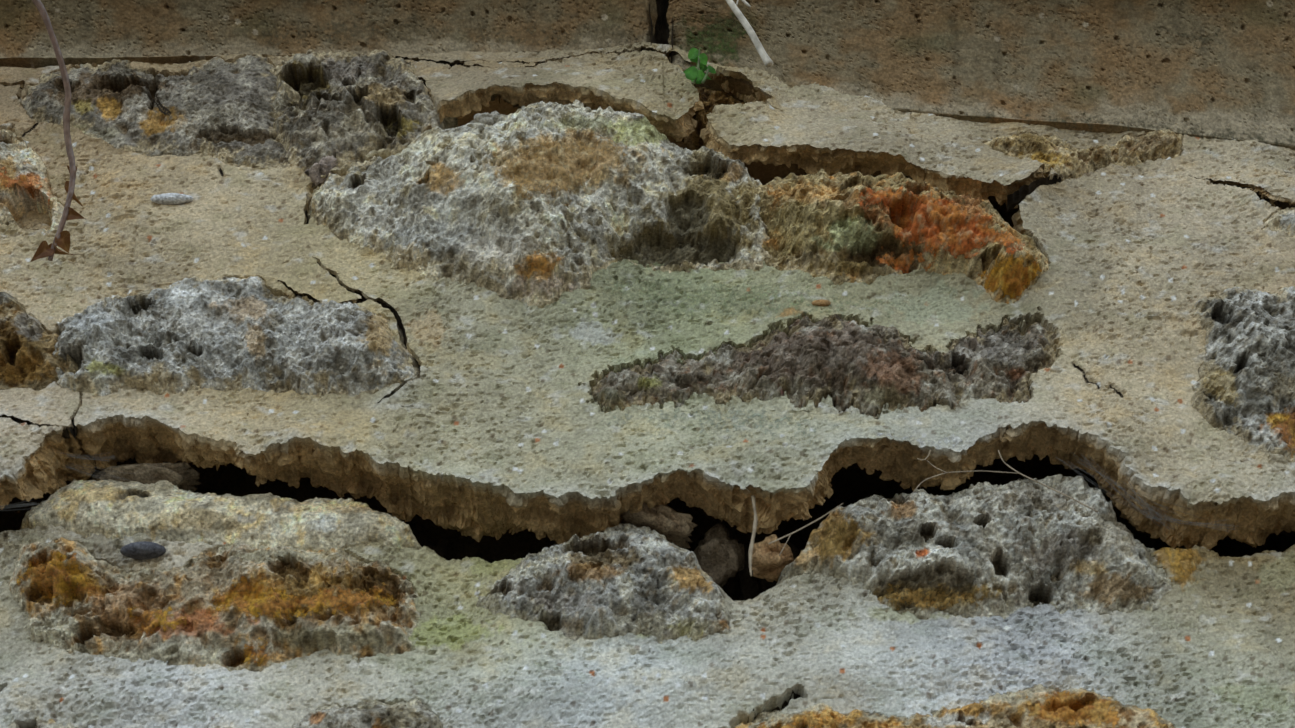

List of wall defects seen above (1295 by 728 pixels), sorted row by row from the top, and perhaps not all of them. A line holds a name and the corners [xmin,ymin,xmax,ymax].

crack [641,0,673,63]
crack [153,95,171,116]
peeling [304,156,339,188]
crack [1224,184,1295,210]
flaking render [270,254,361,304]
crack [284,262,421,398]
crack [11,418,77,439]
flaking render [0,396,1295,588]
crack [404,522,539,563]
crack [684,535,705,552]
crack [722,480,1008,601]
crack [1116,515,1295,557]